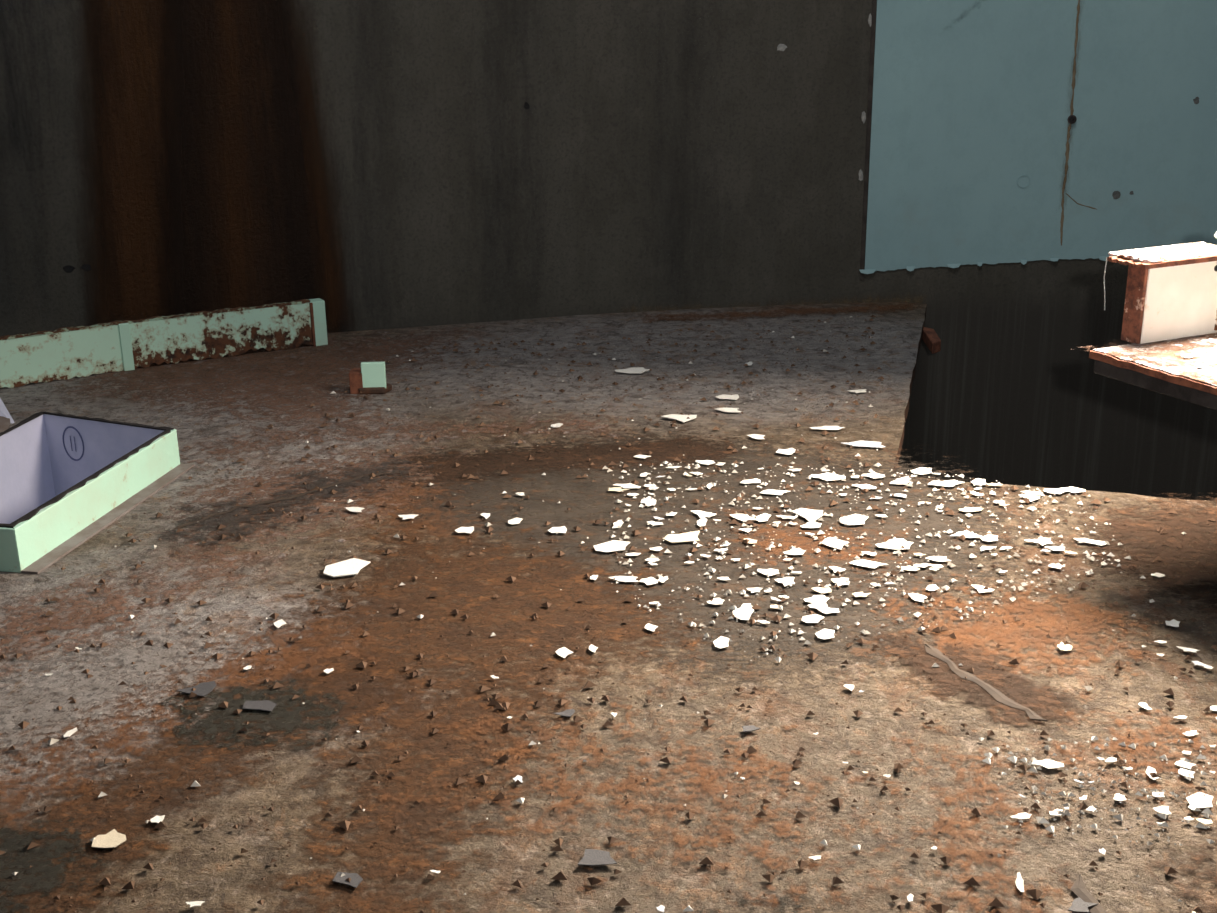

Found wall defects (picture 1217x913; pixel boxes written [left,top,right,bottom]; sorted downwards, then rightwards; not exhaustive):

crack [1060,0,1096,246]
rust [0,0,916,913]
rust [858,497,1217,805]
rust [842,734,1074,913]